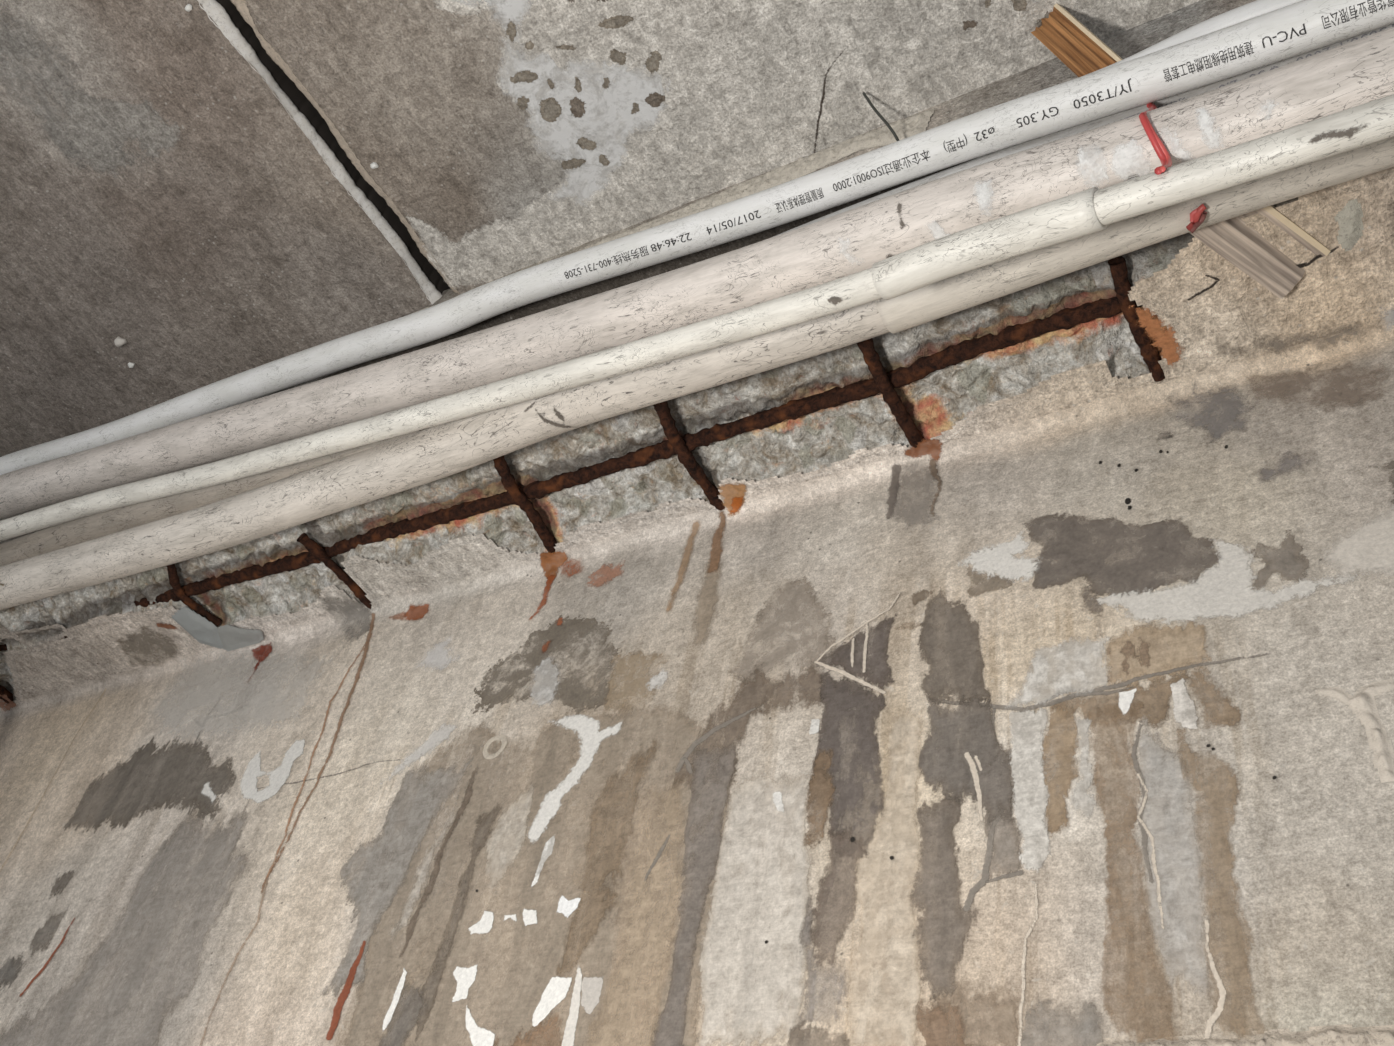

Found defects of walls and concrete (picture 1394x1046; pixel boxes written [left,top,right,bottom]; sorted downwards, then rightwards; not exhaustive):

spalling [1245,171,1394,251]
rust [1129,305,1181,365]
spalling [0,233,1206,709]
rust [886,439,942,524]
rust [529,551,624,620]
rust [667,484,746,643]
water stain [322,461,1394,1046]
water stain [0,736,305,1046]
crack [928,653,1267,1046]